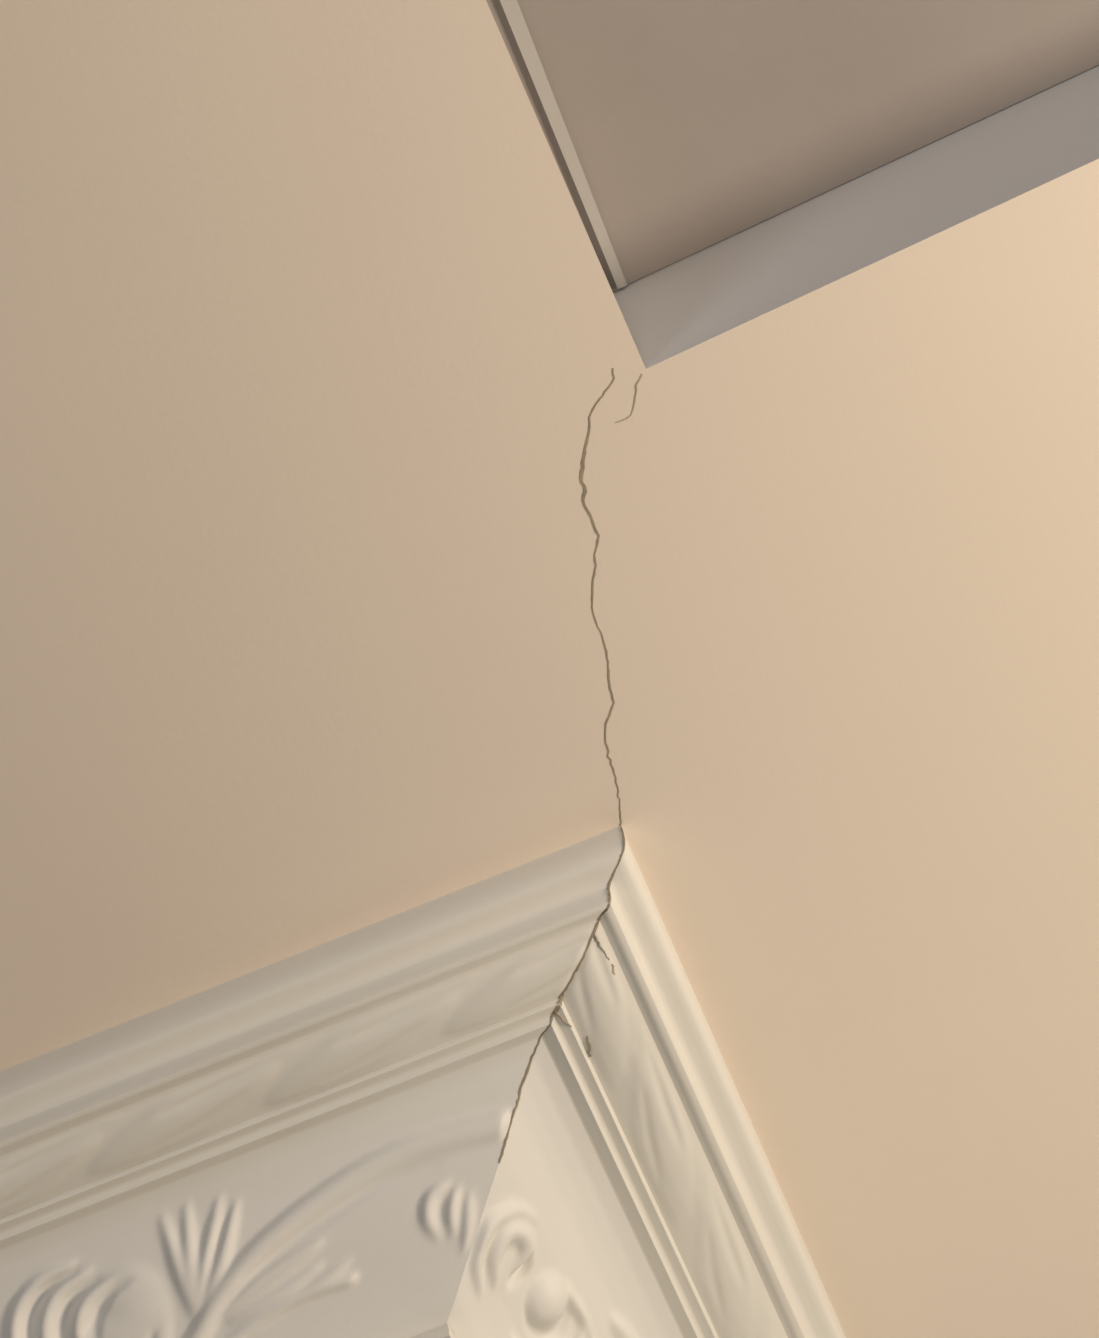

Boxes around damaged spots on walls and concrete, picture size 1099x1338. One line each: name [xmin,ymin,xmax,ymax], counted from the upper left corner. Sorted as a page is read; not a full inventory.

crack [498,368,643,1163]